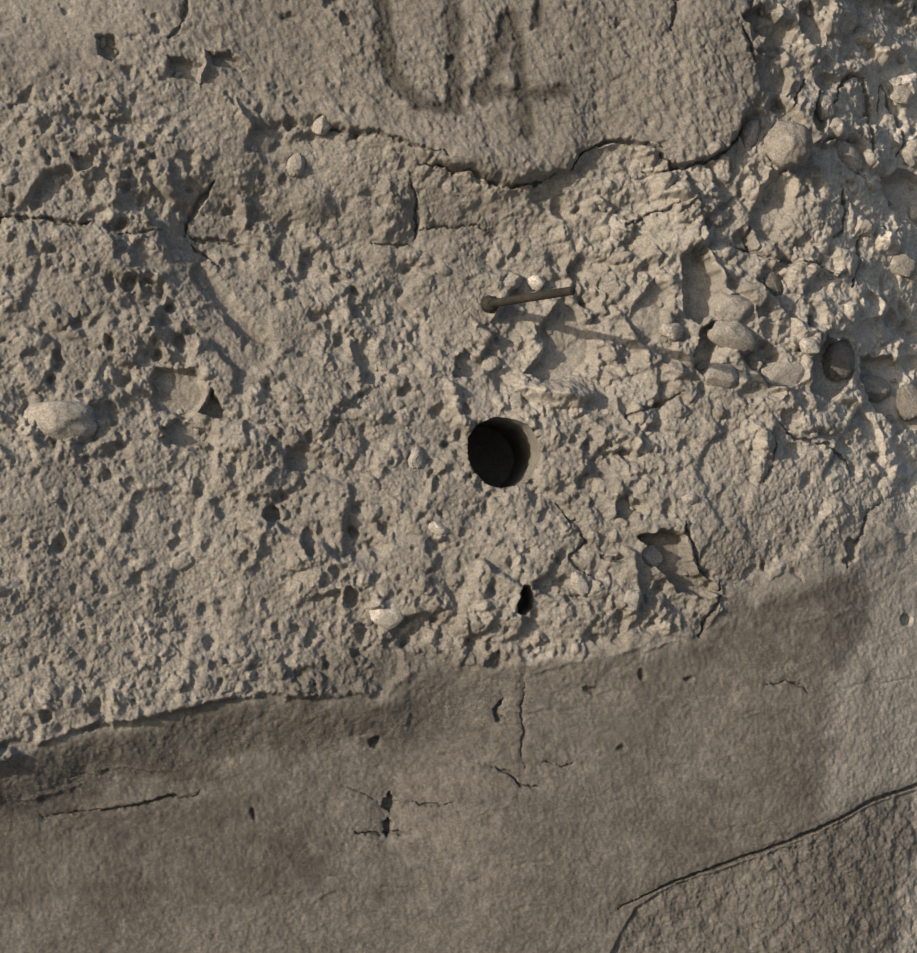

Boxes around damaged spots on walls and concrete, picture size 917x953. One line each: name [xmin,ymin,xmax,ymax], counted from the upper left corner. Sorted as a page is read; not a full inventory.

crack [334,128,739,248]
spalling [245,0,917,485]
spalling [121,237,281,352]
spalling [149,367,232,448]
spalling [300,526,319,559]
spalling [638,528,719,600]
crack [843,503,882,568]
spalling [369,600,404,630]
crack [495,709,563,788]
crack [63,792,200,815]
crack [350,788,409,837]
crack [650,783,917,893]